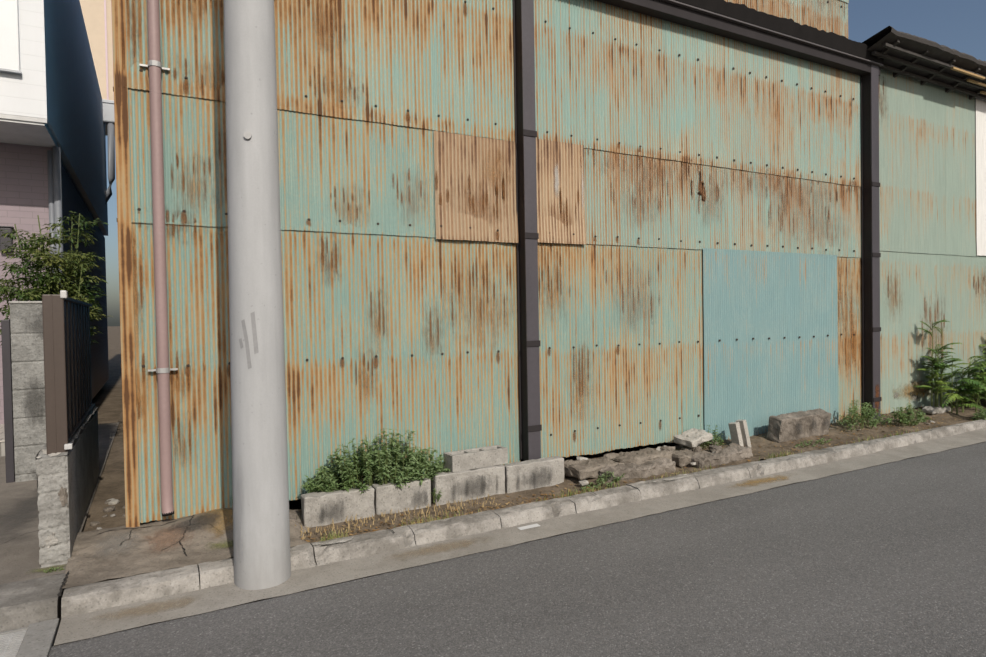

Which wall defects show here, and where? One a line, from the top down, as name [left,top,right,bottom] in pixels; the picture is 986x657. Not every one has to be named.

rust [122,0,136,68]
rust [307,0,346,35]
rust [171,124,225,185]
rust [468,177,505,215]
rust [166,211,196,233]
rust [469,265,505,317]
rust [838,277,856,364]
rust [340,355,378,383]
crack [96,515,220,556]